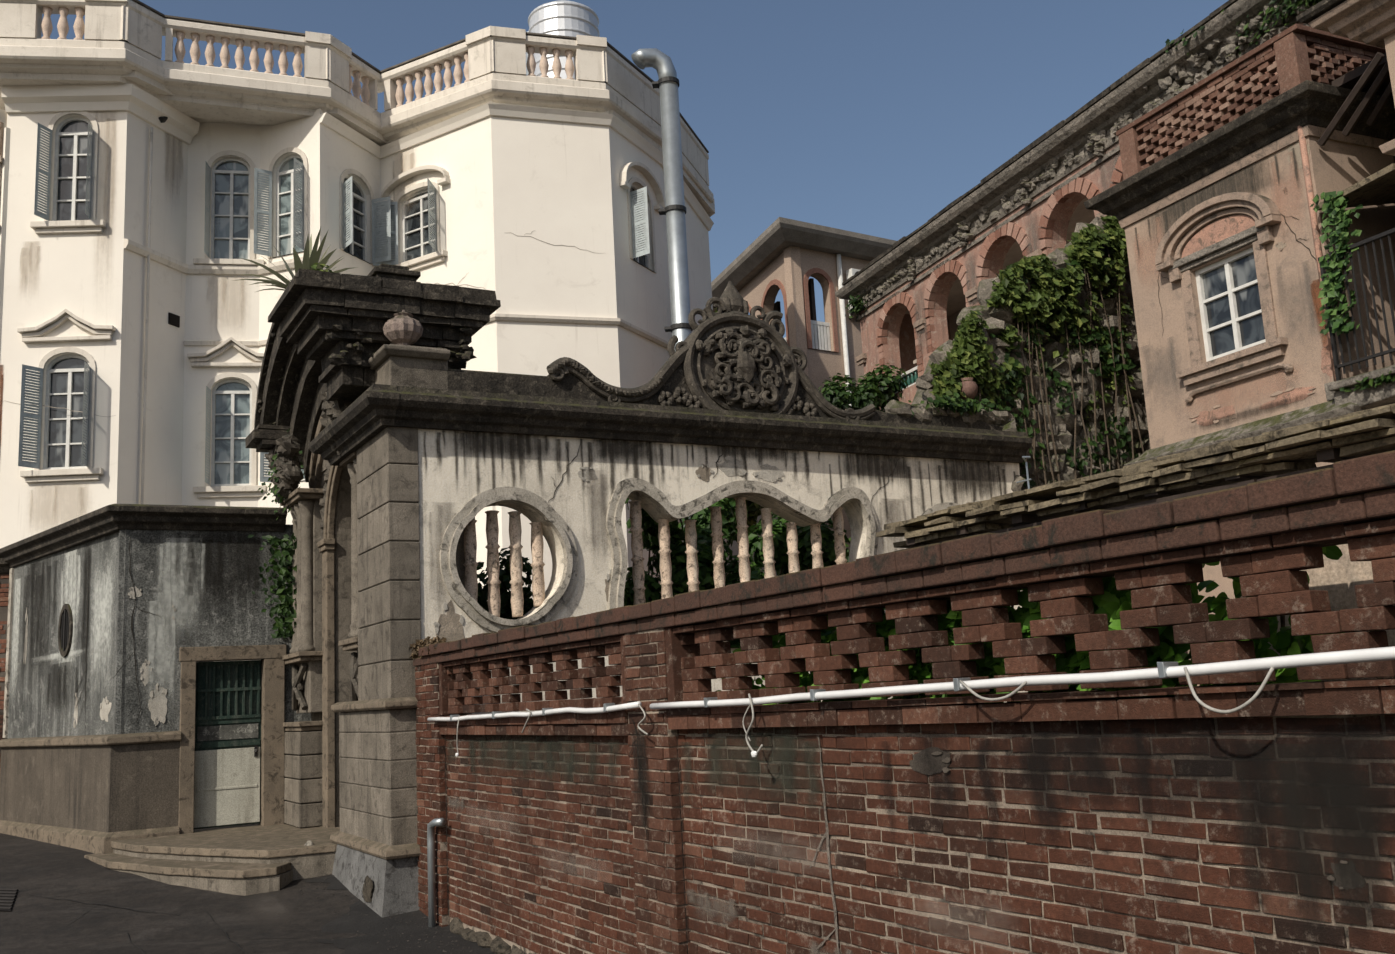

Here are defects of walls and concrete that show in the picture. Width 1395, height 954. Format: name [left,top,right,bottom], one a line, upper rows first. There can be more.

water stain [424,430,1015,519]
peeling [12,538,205,728]